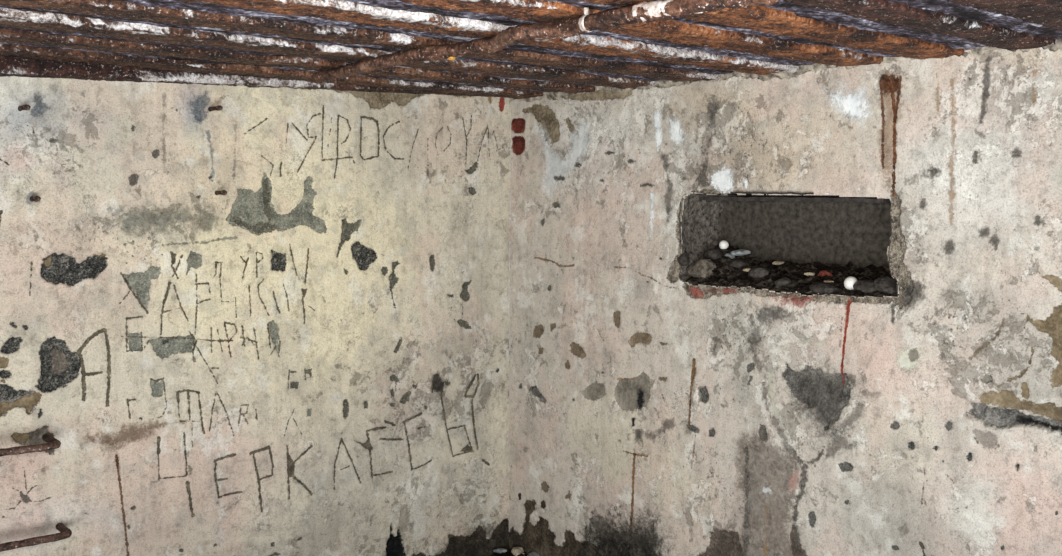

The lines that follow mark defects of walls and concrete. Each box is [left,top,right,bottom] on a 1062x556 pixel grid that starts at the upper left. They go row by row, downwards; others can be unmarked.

corrosion [879,74,902,196]
peeling [110,173,327,246]
flaking render [40,253,108,286]
spalling [271,250,287,272]
flaking render [337,218,400,308]
peeling [1039,272,1062,292]
peeling [969,320,1004,360]
peeling [1026,305,1062,387]
flaking render [0,322,81,455]
peeling [966,347,1062,435]
leakage [413,481,669,556]
leakage [698,431,808,556]